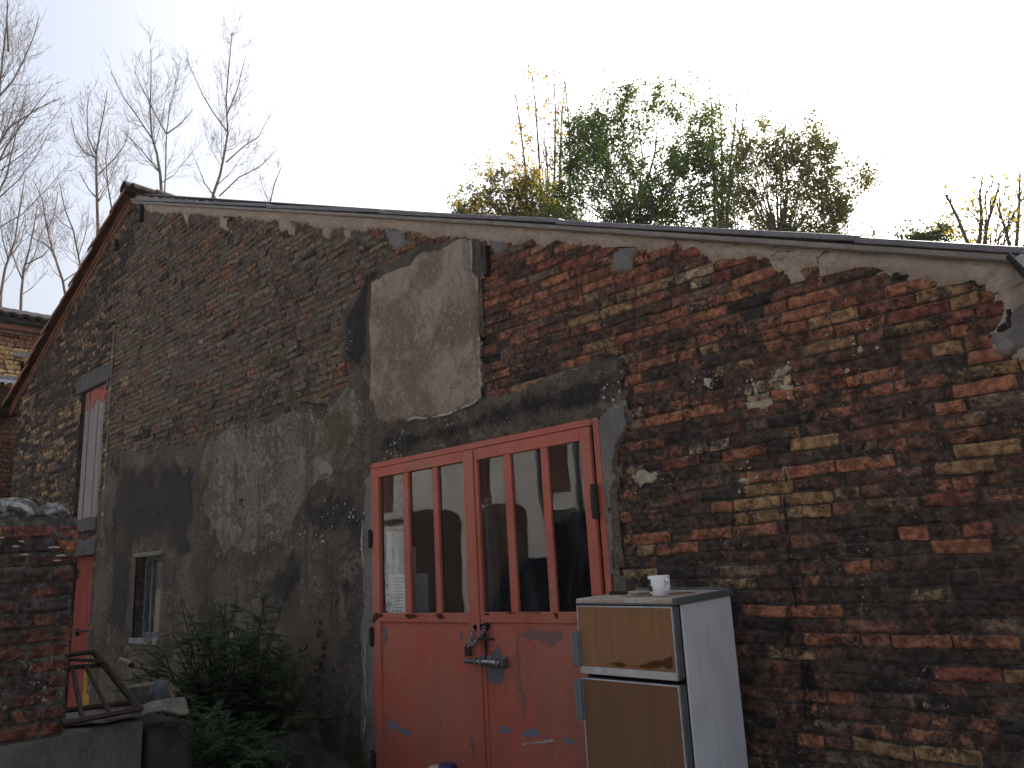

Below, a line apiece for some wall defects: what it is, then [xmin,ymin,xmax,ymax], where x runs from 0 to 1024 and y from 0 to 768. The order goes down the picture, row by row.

spalling [279,219,296,236]
peeling [613,248,636,273]
peeling [771,259,805,284]
spalling [991,303,1024,357]
peeling [85,386,106,412]
peeling [383,326,482,460]
water stain [472,381,604,428]
water stain [110,458,211,627]